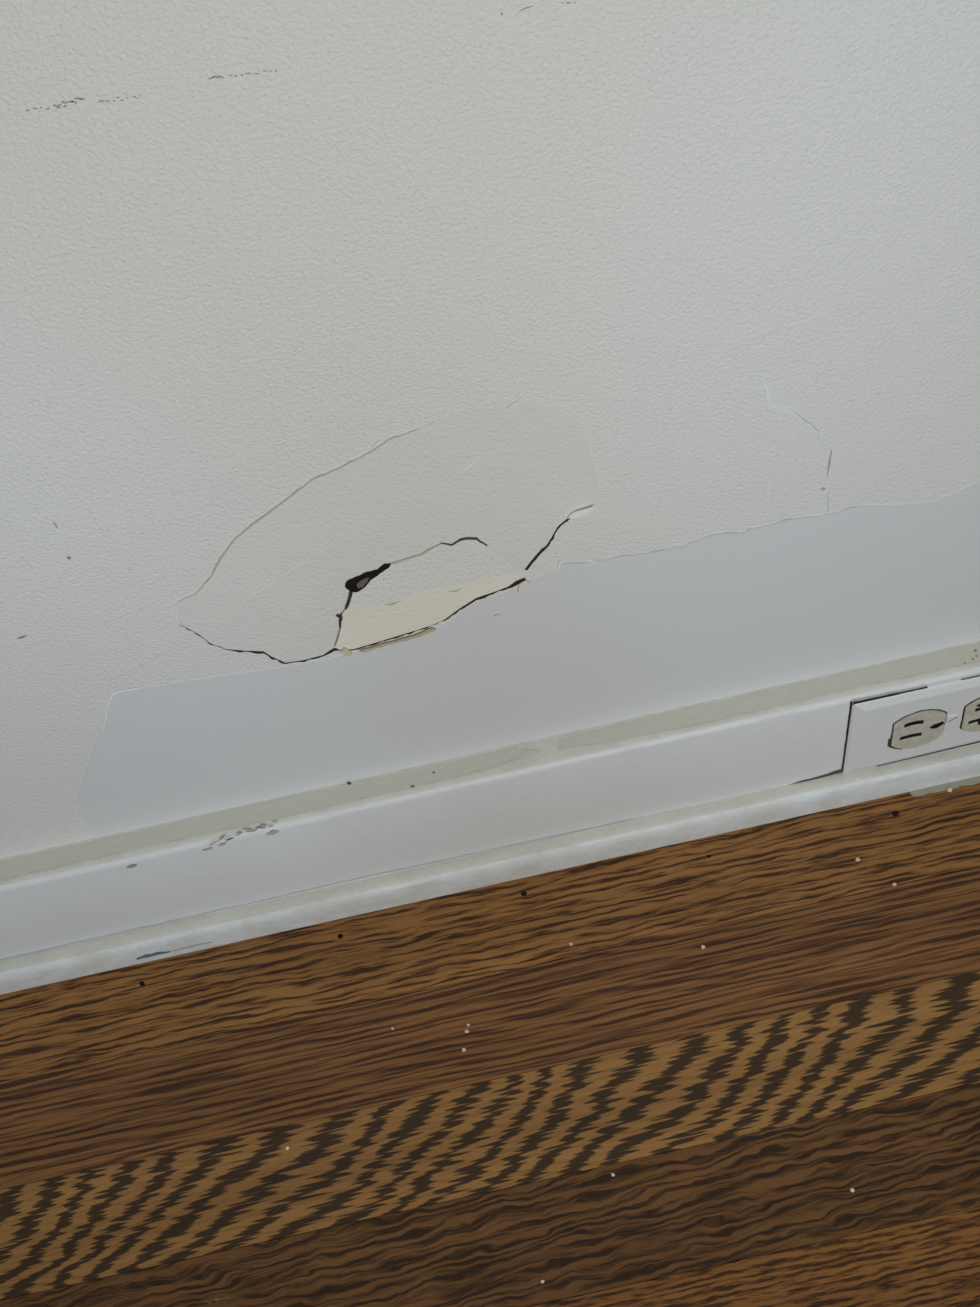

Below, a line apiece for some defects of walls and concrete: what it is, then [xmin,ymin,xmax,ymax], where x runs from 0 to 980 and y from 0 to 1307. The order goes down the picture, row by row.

crack [179,429,570,664]
flaking render [334,564,530,657]